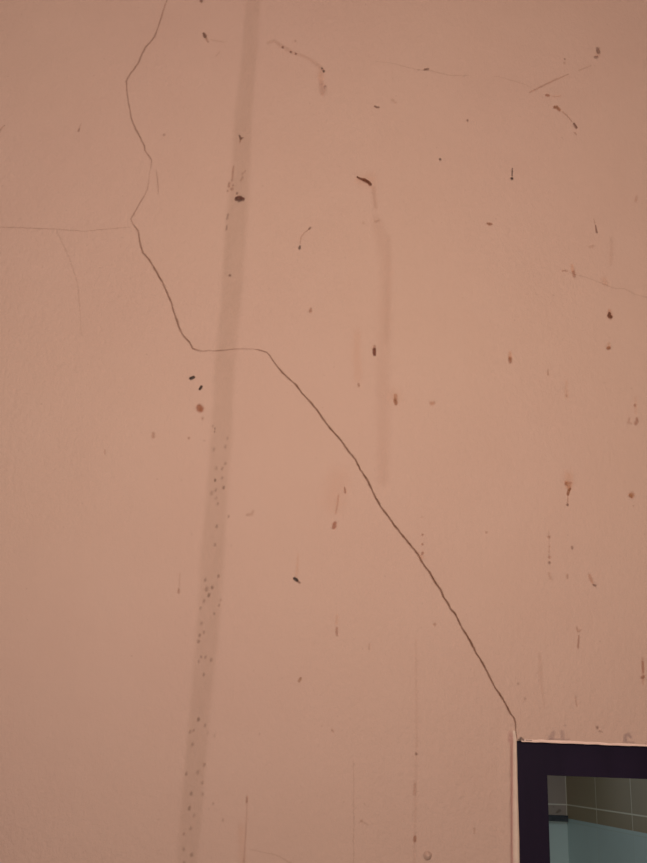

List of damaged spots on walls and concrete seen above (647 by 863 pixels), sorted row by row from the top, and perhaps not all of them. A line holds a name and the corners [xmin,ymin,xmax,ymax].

crack [281,371,516,724]